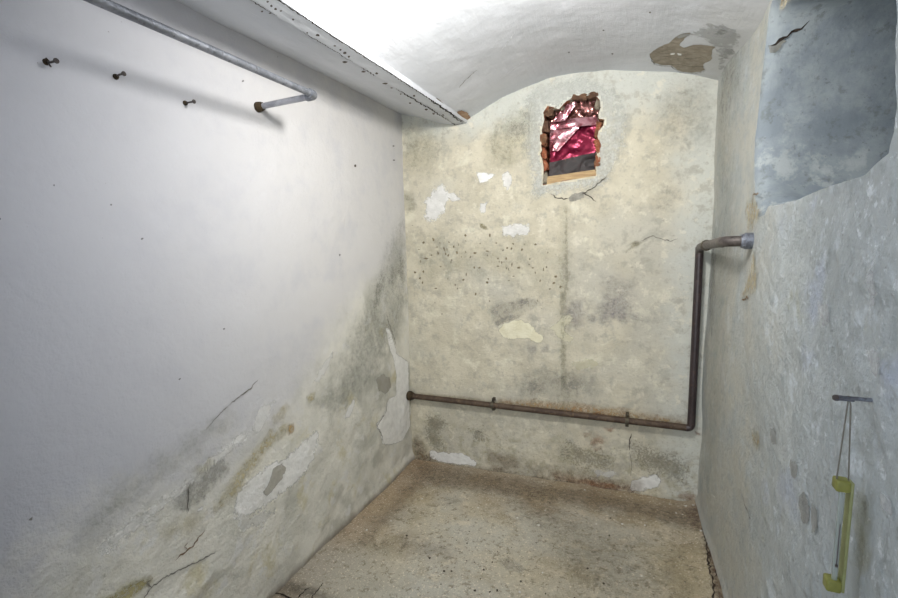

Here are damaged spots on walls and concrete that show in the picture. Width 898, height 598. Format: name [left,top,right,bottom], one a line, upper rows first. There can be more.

flaking render [650,33,715,74]
crack [769,20,810,53]
spalling [540,92,602,184]
peeling [424,184,460,221]
flaking render [553,176,607,202]
damp [414,224,547,289]
peeling [499,314,574,343]
peeling [376,314,410,445]
peeling [234,431,319,517]
peeling [430,450,477,466]
crack [144,532,215,598]
crack [704,535,717,598]